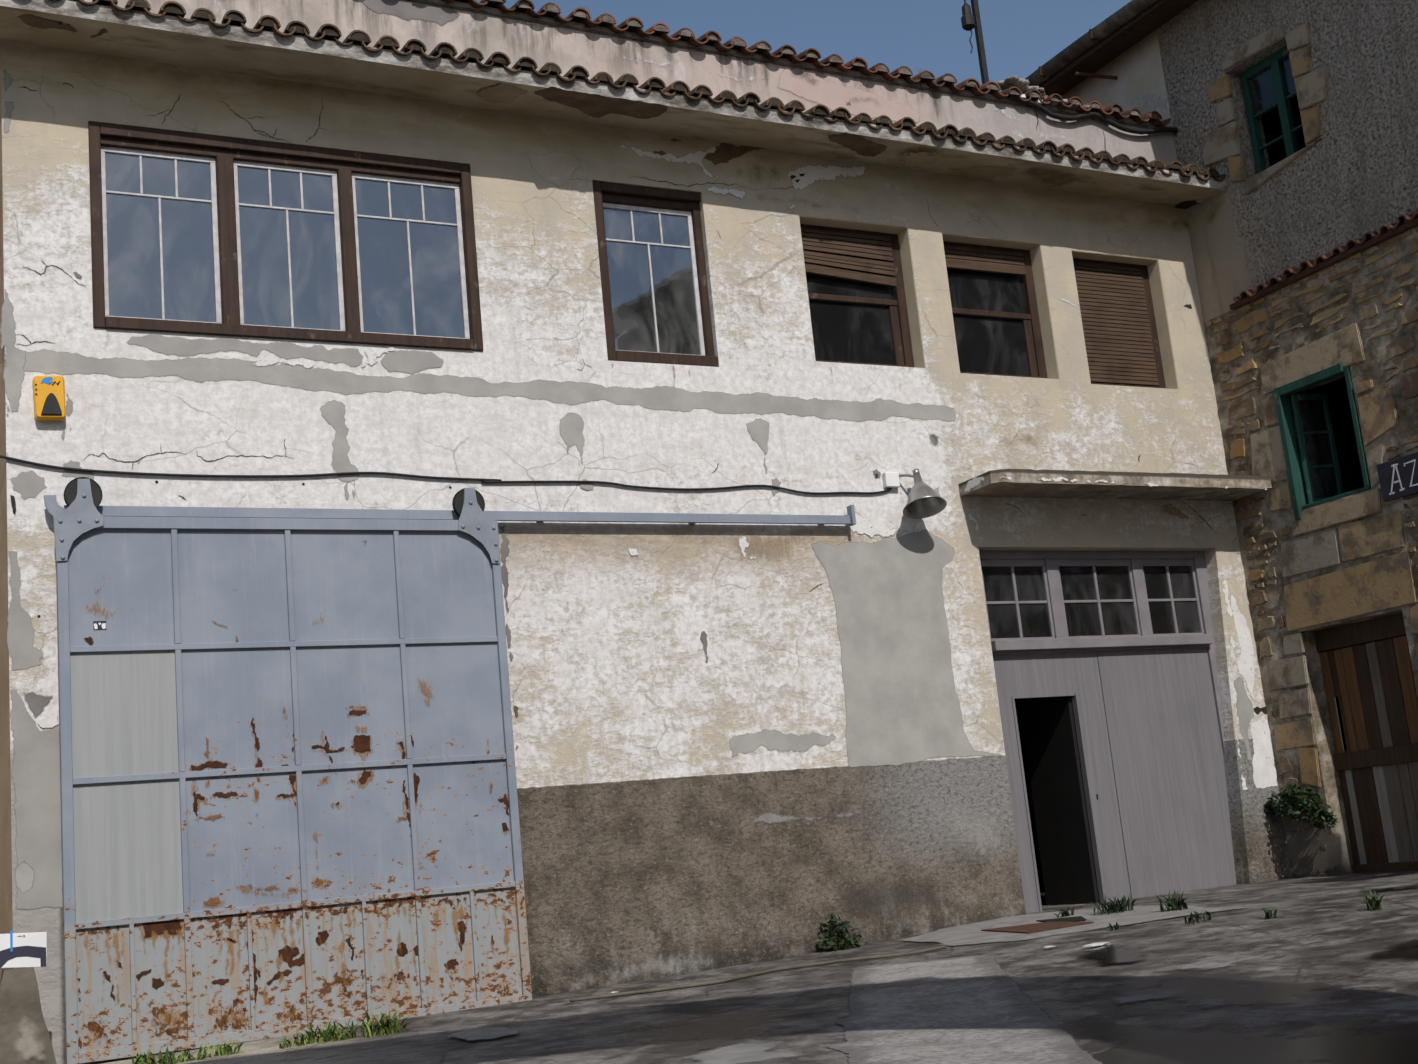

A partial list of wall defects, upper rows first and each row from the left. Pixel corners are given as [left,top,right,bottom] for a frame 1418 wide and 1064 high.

flaking render [362,0,459,25]
crack [220,98,326,144]
spalling [606,138,766,200]
peeling [787,132,887,210]
peeling [362,346,395,368]
crack [84,438,290,470]
spalling [25,693,59,728]
corrosion [189,738,259,820]
corrosion [312,705,374,788]
corrosion [86,919,184,1002]
corrosion [203,897,305,1035]
corrosion [315,906,364,998]